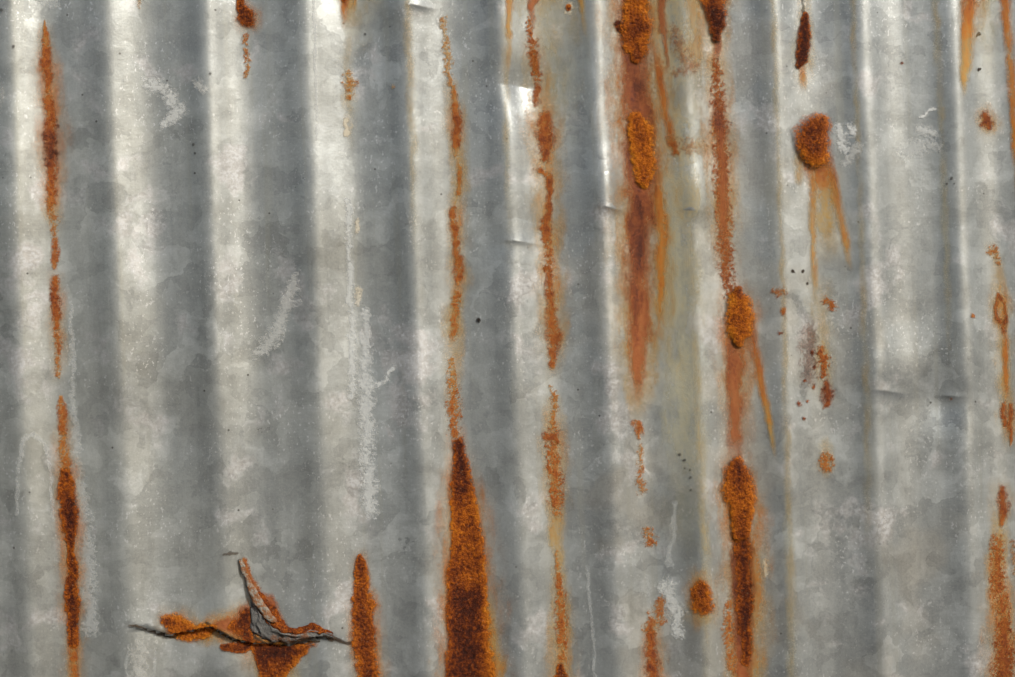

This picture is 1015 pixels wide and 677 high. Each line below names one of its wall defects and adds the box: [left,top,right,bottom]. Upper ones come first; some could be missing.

rust [40,20,63,379]
rust [525,0,563,369]
rust [612,0,679,386]
rust [690,0,773,677]
rust [795,12,812,83]
rust [791,113,849,285]
rust [56,395,81,677]
crack [129,624,177,638]
rust [161,606,315,677]
crack [205,622,351,647]
rust [351,554,380,677]
rust [442,357,506,677]